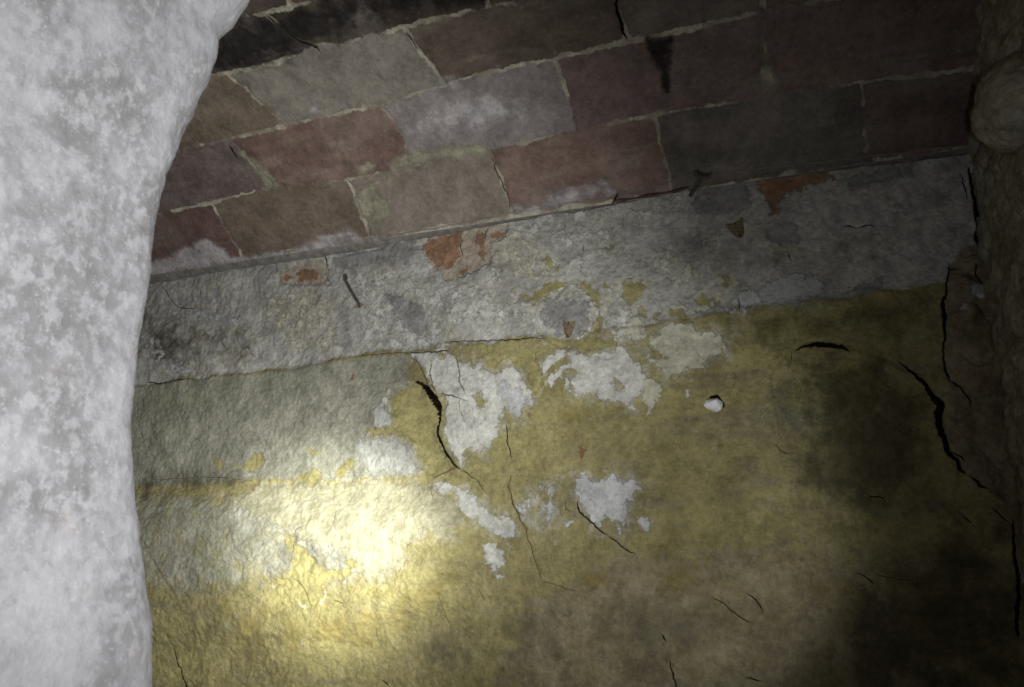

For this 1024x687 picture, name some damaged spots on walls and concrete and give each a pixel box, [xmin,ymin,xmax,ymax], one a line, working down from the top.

crack [362,337,541,488]
peeling [237,223,825,614]
crack [788,342,849,369]
crack [897,167,1022,637]
crack [506,426,577,592]
crack [565,501,635,554]